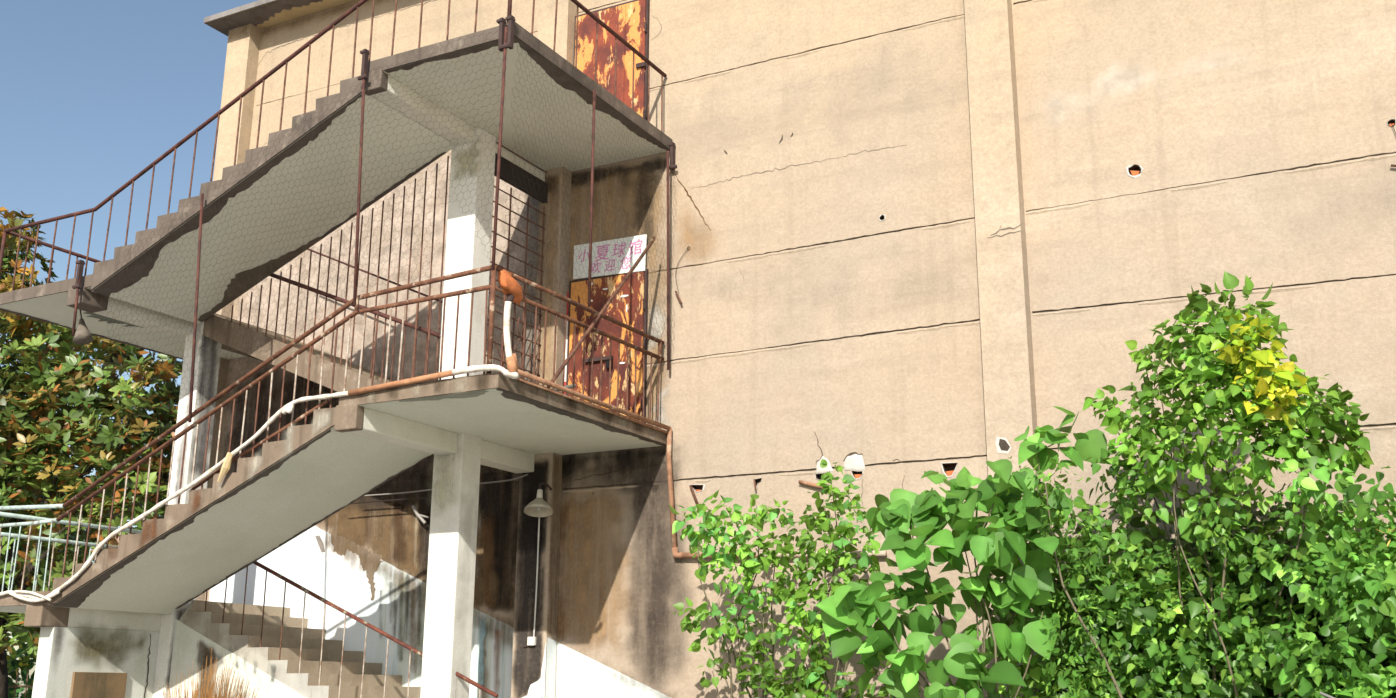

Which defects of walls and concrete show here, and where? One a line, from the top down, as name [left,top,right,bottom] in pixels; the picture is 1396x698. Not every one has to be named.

damp [235,146,667,427]
damp [175,336,339,504]
damp [324,454,449,639]
damp [474,449,683,698]